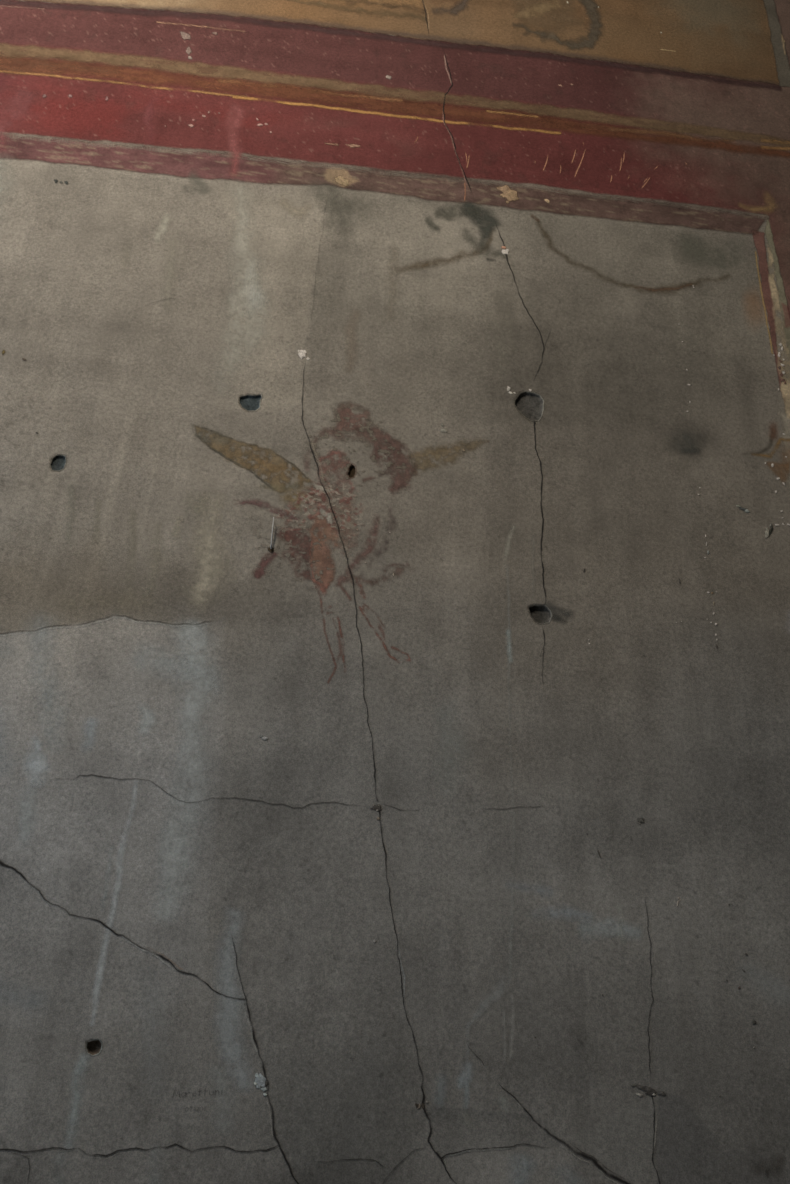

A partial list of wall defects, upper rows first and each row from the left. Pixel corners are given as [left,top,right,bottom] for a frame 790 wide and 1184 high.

crack [227,797,346,808]
crack [302,371,629,1184]
crack [0,861,299,1184]
crack [646,909,660,1184]